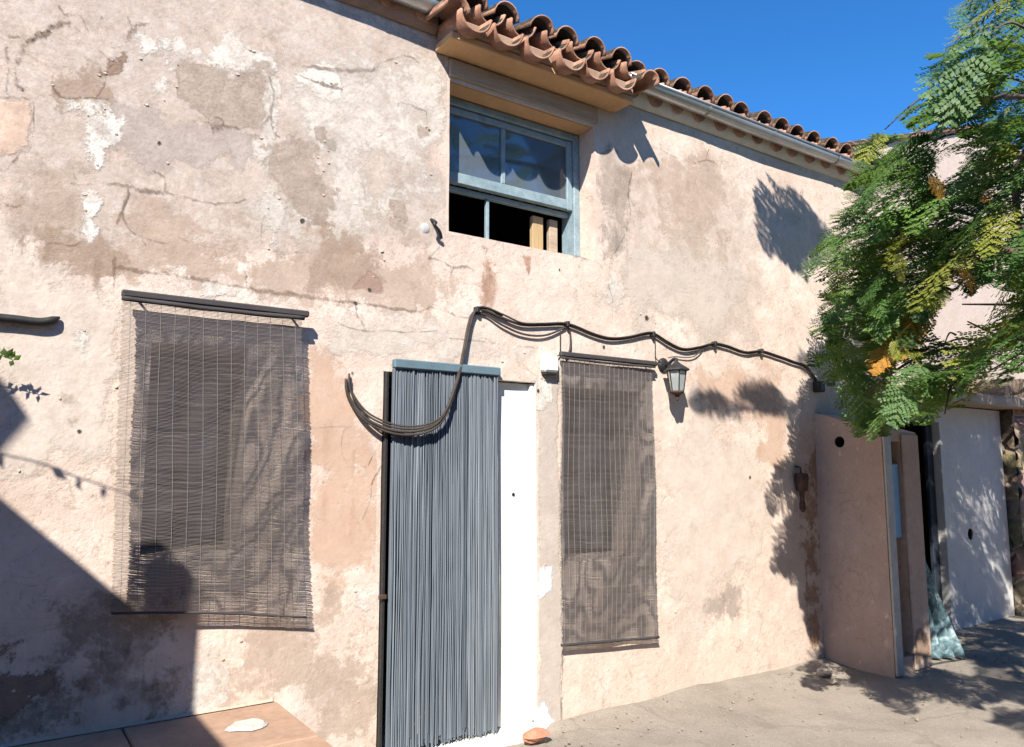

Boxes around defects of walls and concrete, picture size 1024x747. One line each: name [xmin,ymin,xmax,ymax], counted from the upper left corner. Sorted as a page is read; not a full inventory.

crack [119,185,164,243]
peeling [0,0,447,480]
damp [801,449,822,647]